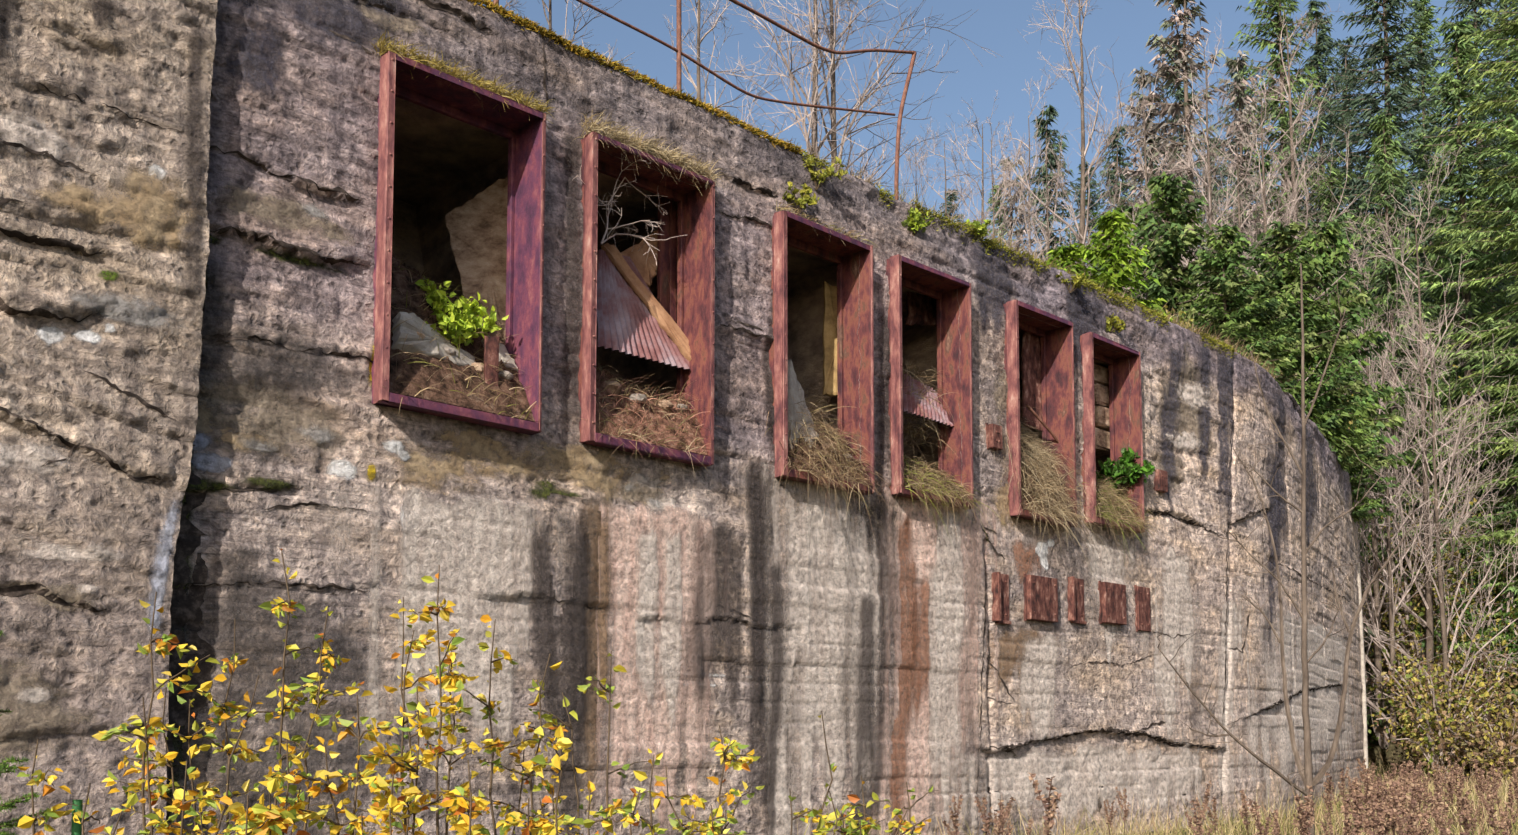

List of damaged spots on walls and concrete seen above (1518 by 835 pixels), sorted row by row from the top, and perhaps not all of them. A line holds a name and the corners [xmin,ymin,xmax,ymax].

damp [92,0,110,25]
crack [0,297,100,322]
crack [0,370,381,823]
damp [148,134,1356,835]
corrosion [890,519,930,833]
crack [976,392,1353,822]